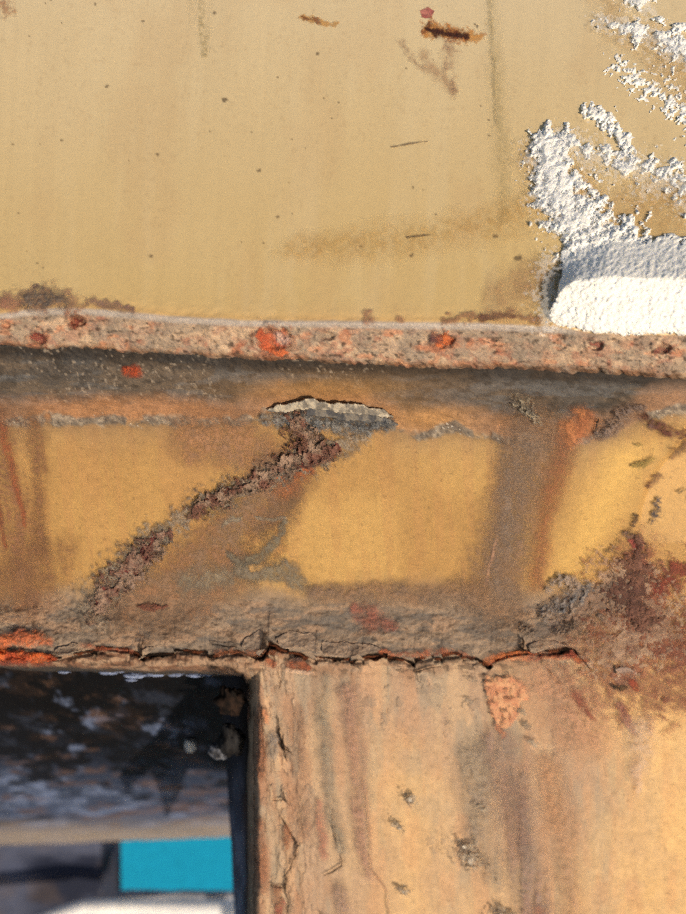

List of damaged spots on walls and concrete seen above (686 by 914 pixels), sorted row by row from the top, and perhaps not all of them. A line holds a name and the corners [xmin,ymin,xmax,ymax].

rust [421,20,483,43]
rust [0,284,135,314]
rust [442,288,542,325]
peeling [259,398,398,481]
rust [110,417,313,633]
rust [0,629,56,666]
crack [8,630,590,708]
rust [471,534,686,749]
crack [253,708,298,914]
crack [323,813,343,876]